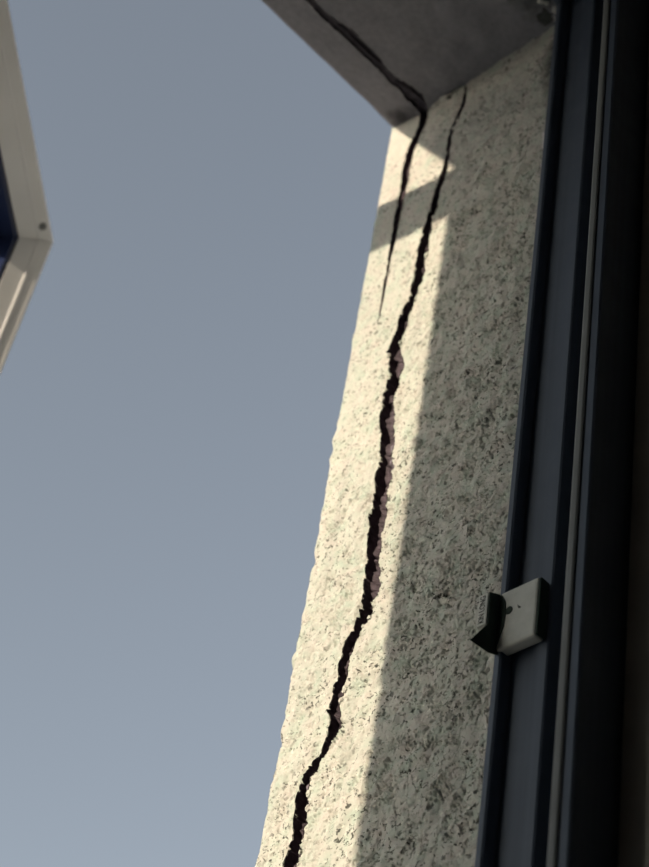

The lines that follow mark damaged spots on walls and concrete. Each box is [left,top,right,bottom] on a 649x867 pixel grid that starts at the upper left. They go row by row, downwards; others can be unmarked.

crack [282,0,467,867]